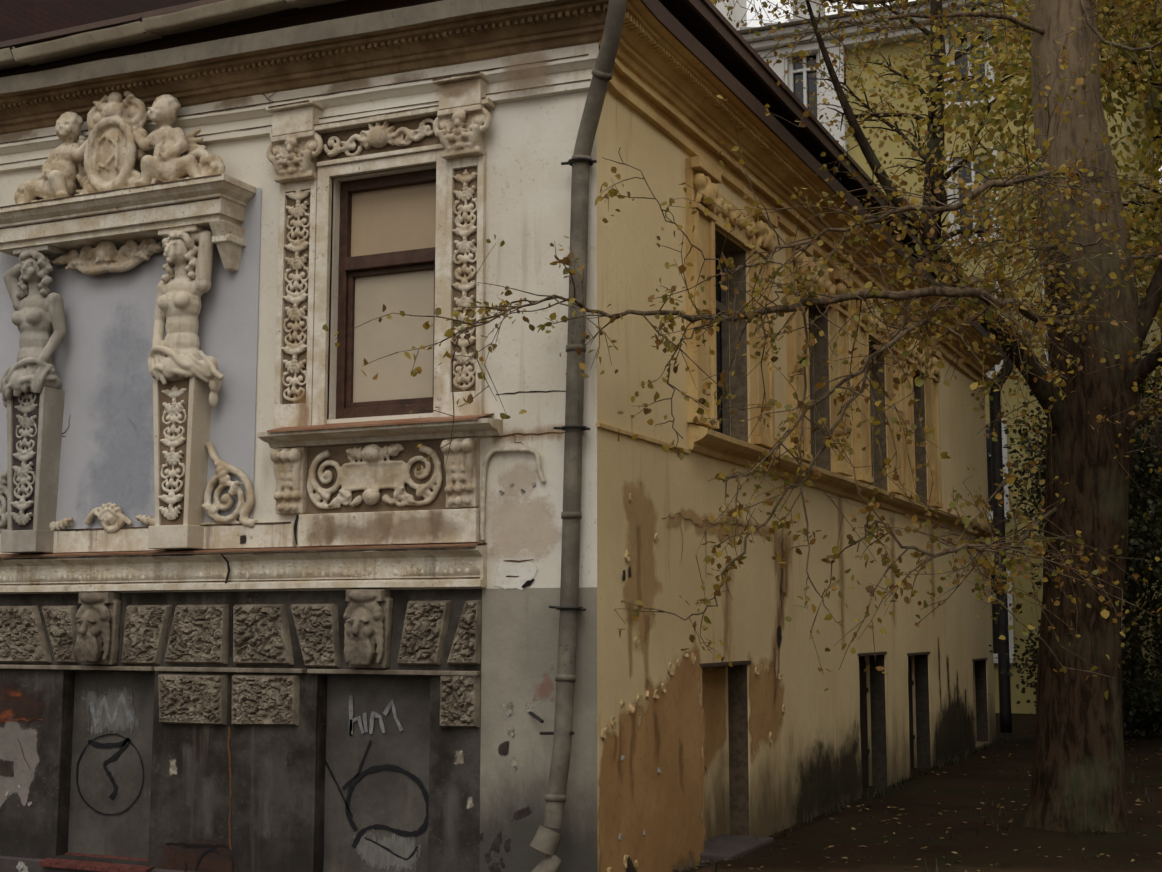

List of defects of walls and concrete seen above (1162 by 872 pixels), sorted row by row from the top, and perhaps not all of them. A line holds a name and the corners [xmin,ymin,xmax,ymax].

flaking render [749,662,786,755]
flaking render [598,649,727,872]
damp [796,729,862,825]